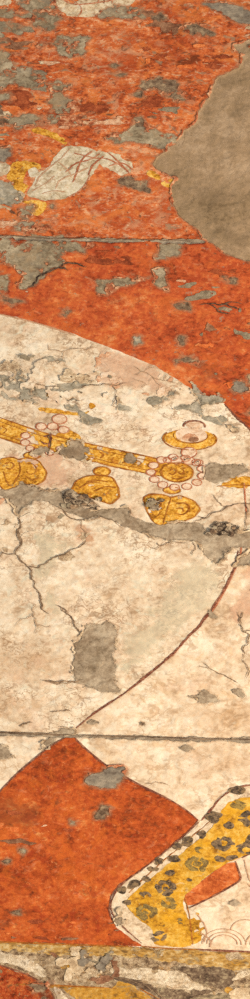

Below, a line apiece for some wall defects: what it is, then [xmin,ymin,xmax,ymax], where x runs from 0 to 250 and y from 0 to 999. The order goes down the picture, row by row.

flaking render [95,0,250,69]
flaking render [0,0,198,163]
flaking render [0,180,133,308]
flaking render [95,243,238,312]
flaking render [131,335,145,347]
flaking render [142,322,250,433]
flaking render [27,484,102,523]
flaking render [145,498,165,511]
crack [0,508,121,633]
flaking render [71,621,122,694]
peeling [160,988,212,999]
peeling [229,987,250,999]